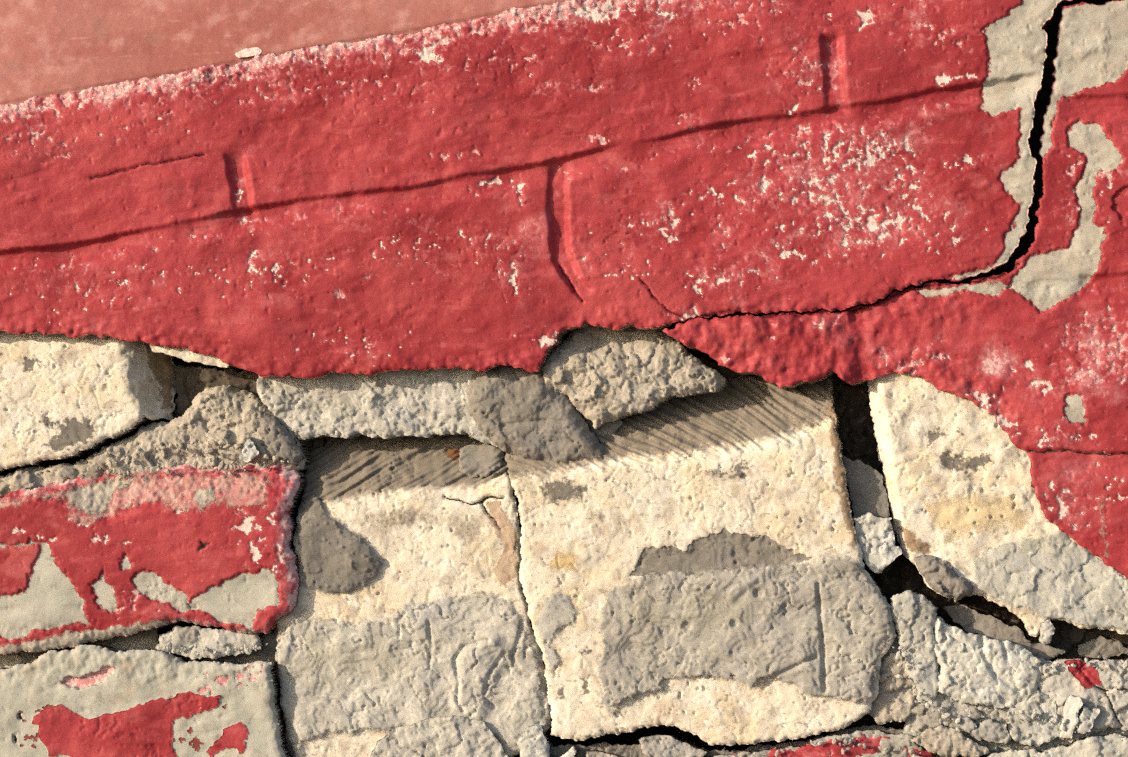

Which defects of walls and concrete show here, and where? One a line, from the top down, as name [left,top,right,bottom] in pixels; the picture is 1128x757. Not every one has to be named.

peeling [620,46,960,265]
crack [640,0,1120,318]
crack [559,266,583,302]
peeling [667,260,766,321]
peeling [1010,305,1128,557]
crack [833,373,1039,638]
spalling [629,528,812,578]
spalling [853,512,903,574]
peeling [14,664,264,757]
spalling [517,725,621,757]
peeling [1064,659,1101,688]
crack [1081,670,1127,727]